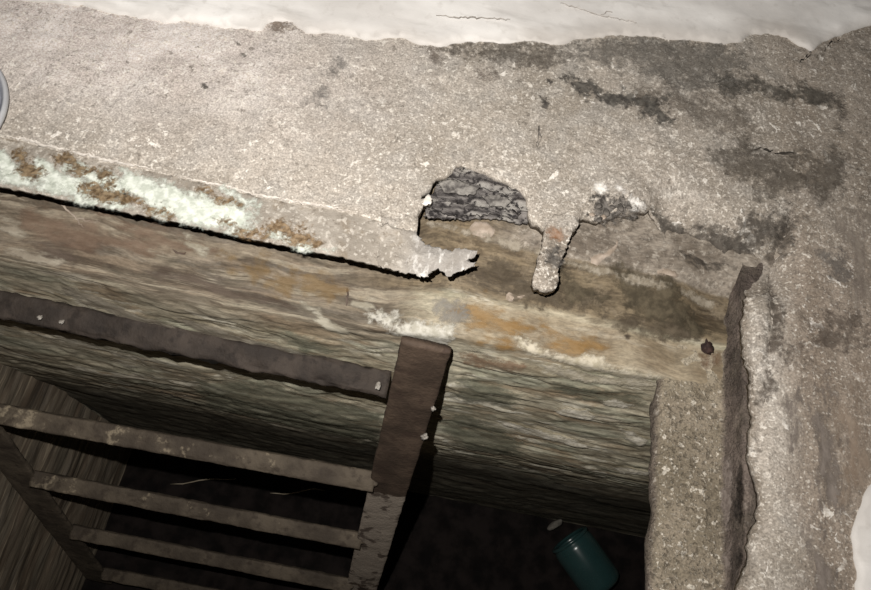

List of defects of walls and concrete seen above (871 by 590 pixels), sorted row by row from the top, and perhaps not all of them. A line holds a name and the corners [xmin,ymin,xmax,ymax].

crack [436,13,507,21]
water stain [559,74,675,124]
water stain [715,75,844,118]
water stain [717,138,844,206]
spalling [586,182,646,226]
water stain [0,218,73,266]
water stain [186,234,208,256]
water stain [156,266,349,334]